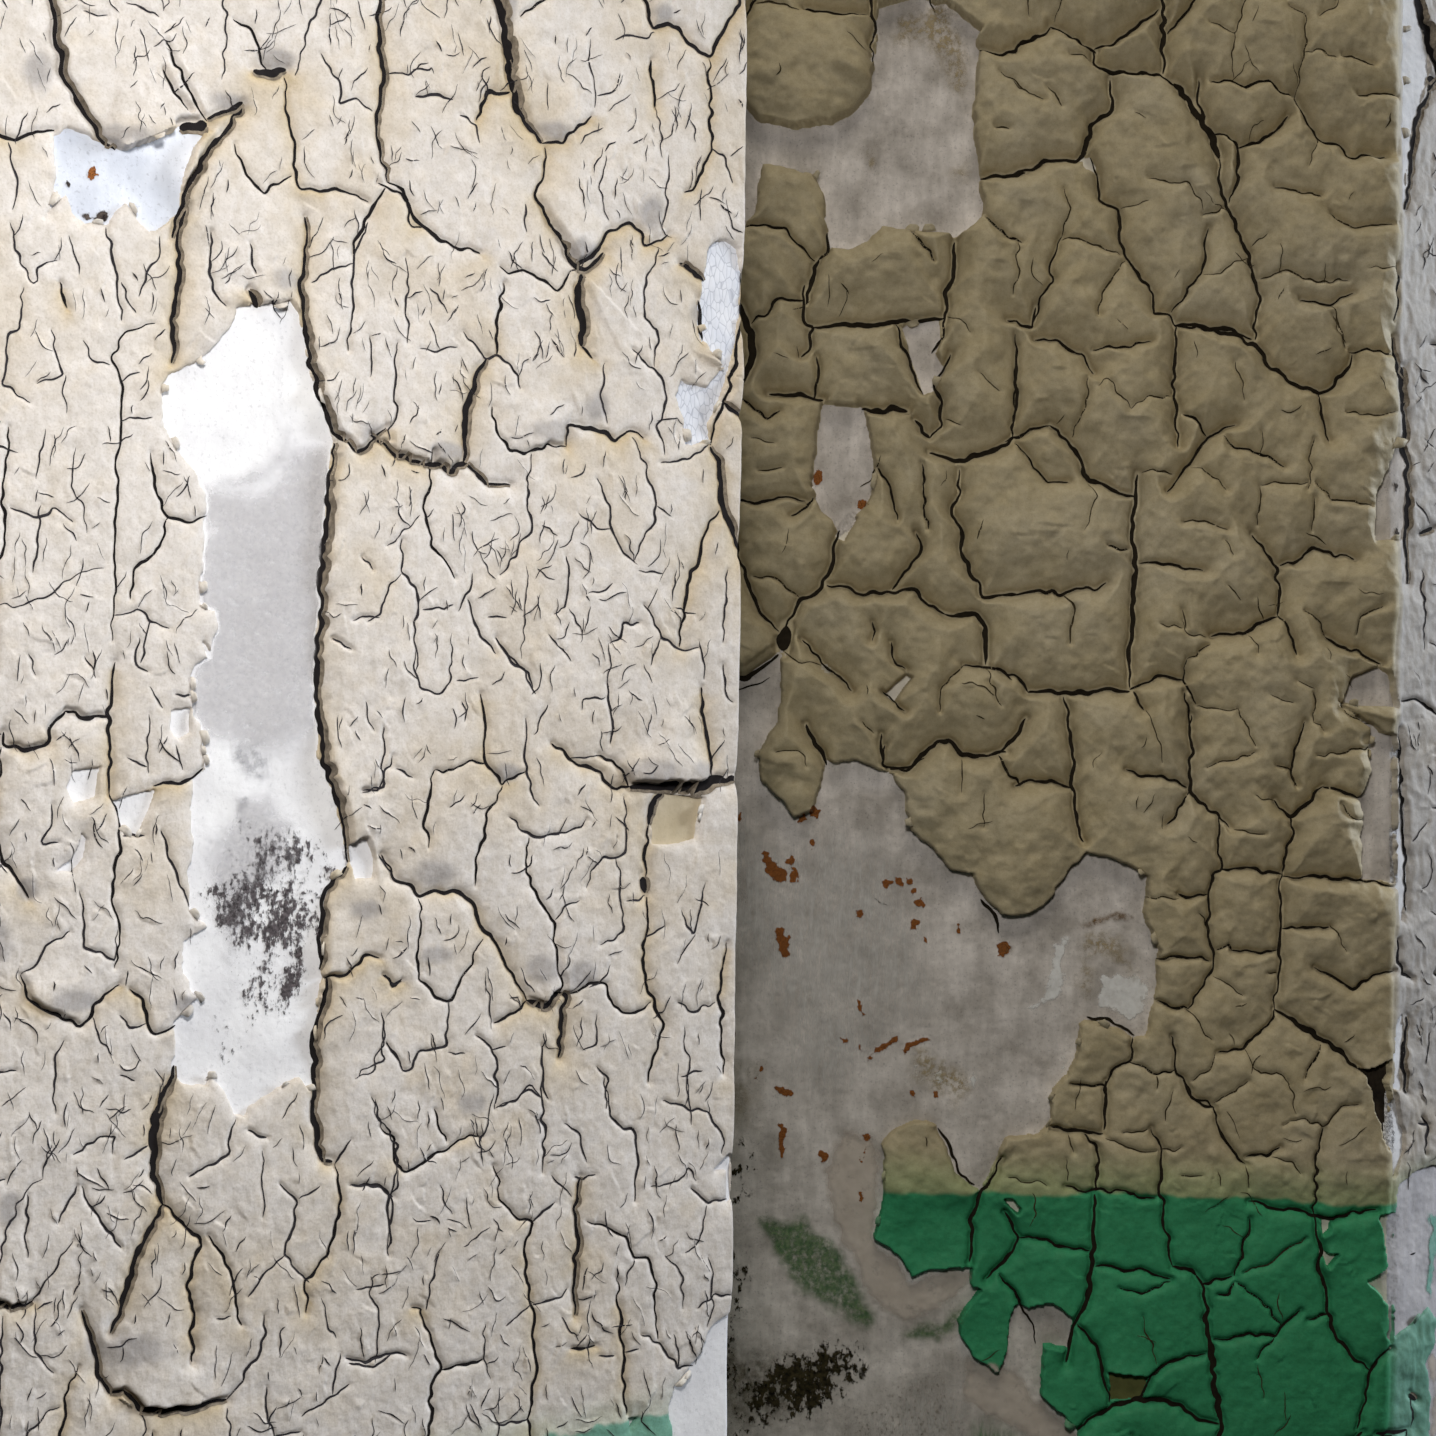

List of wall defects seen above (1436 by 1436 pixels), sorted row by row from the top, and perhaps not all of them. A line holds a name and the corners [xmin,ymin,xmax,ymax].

peeling [49,126,202,232]
peeling [161,301,373,1116]
damp [200,801,335,1025]
crack [363,702,413,794]
crack [405,692,562,885]
rust [761,851,799,883]
rust [882,877,927,943]
rust [839,1036,930,1060]
peeling [668,650,1159,1436]
crack [1314,934,1436,1190]
damp [731,1142,755,1203]
damp [727,1250,868,1436]